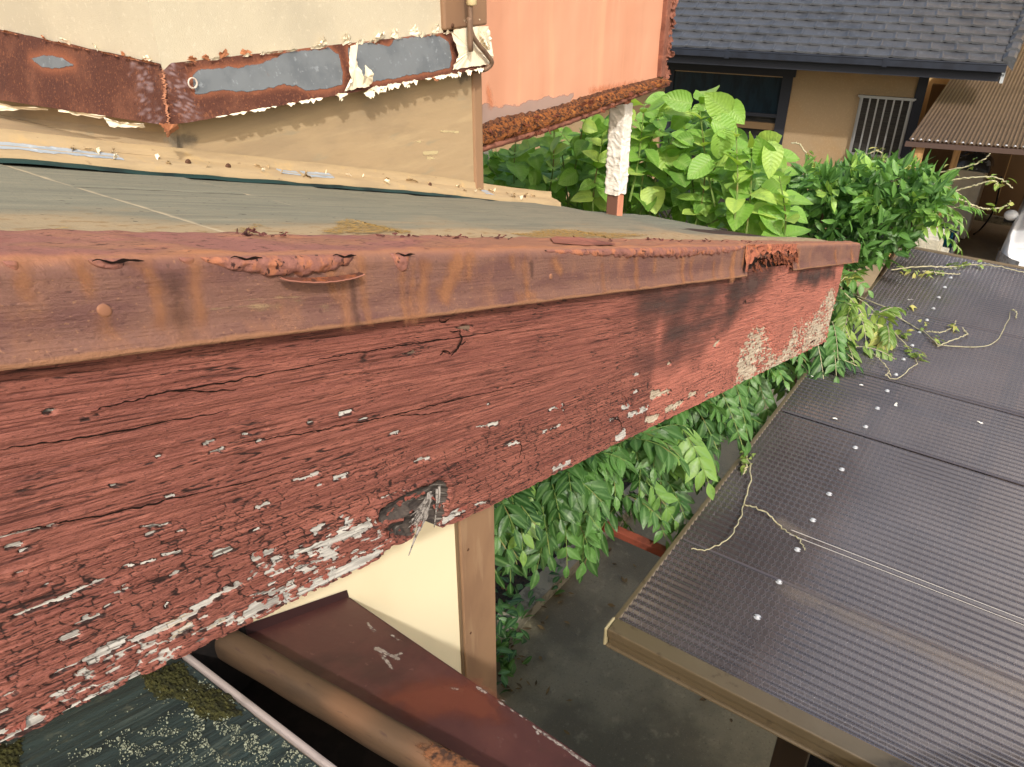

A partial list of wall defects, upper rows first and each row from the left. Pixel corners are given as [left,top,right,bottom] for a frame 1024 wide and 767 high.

corrosion [160,68,170,124]
peeling [186,19,494,117]
corrosion [483,78,672,146]
crack [0,318,554,450]
peeling [609,389,713,441]
peeling [736,288,836,384]
peeling [0,490,487,742]